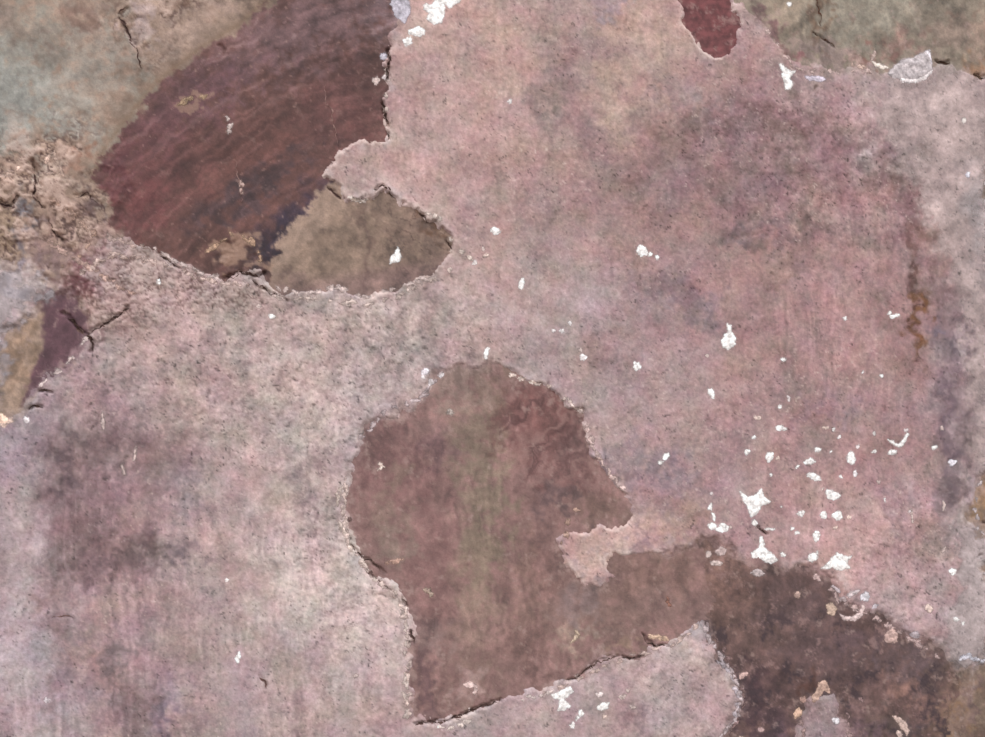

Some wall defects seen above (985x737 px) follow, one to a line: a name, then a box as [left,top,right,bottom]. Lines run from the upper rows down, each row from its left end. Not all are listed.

crack [118,7,141,67]
spalling [678,0,985,83]
spalling [0,0,489,307]
spalling [0,293,88,428]
crack [64,308,129,351]
spalling [336,363,985,737]